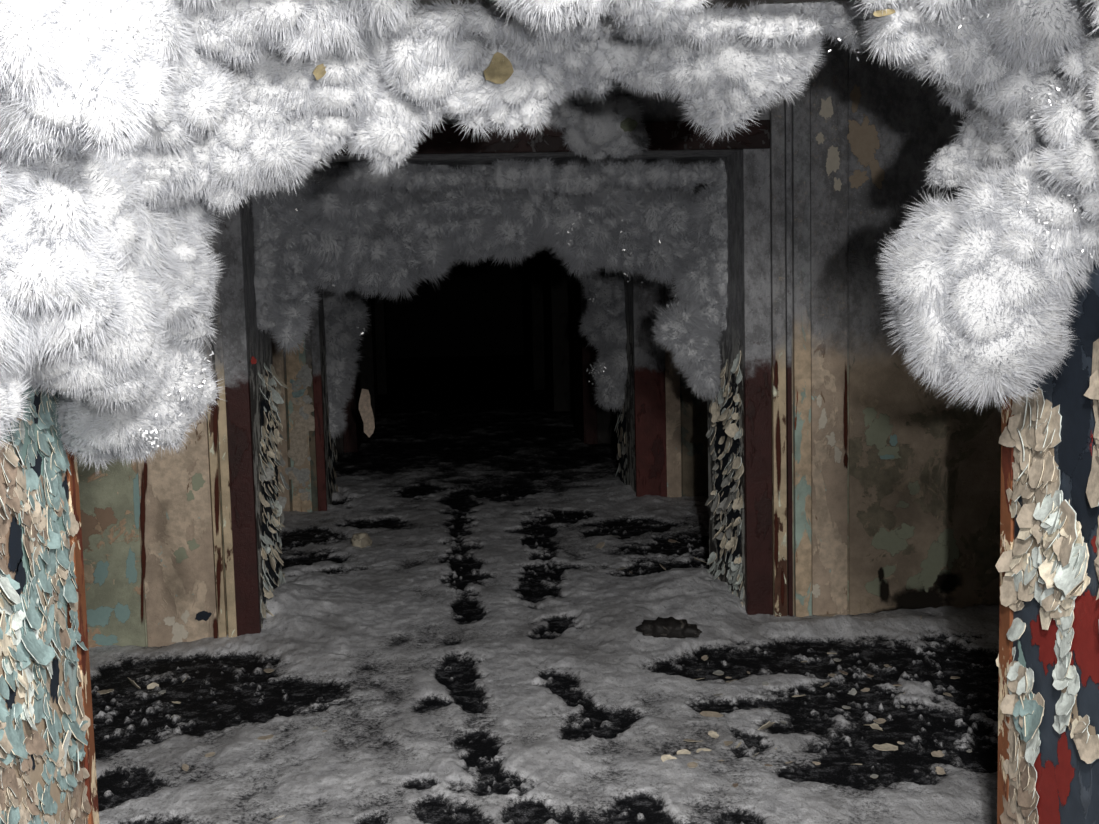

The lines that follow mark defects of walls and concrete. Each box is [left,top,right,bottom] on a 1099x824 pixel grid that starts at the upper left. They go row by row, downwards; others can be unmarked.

spalling [815,84,885,191]
peeling [0,379,130,824]
peeling [251,356,338,628]
peeling [694,351,745,607]
peeling [863,407,902,460]
peeling [865,523,915,597]
peeling [906,528,959,593]
peeling [995,289,1099,824]